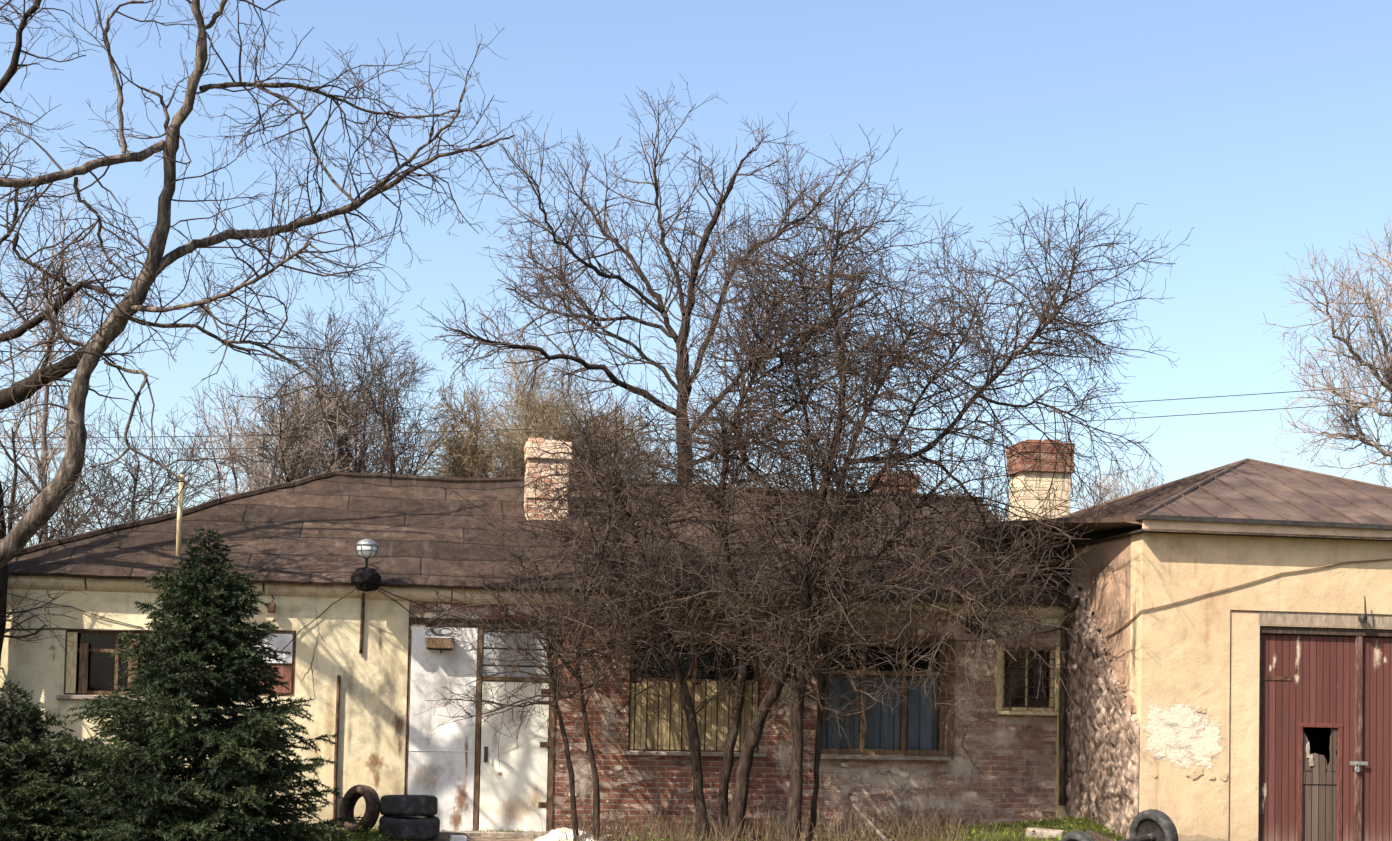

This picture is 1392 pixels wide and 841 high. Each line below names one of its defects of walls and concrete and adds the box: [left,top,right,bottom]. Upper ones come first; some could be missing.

spalling [955,573,1228,839]
corrosion [366,754,381,785]
corrosion [453,785,467,830]